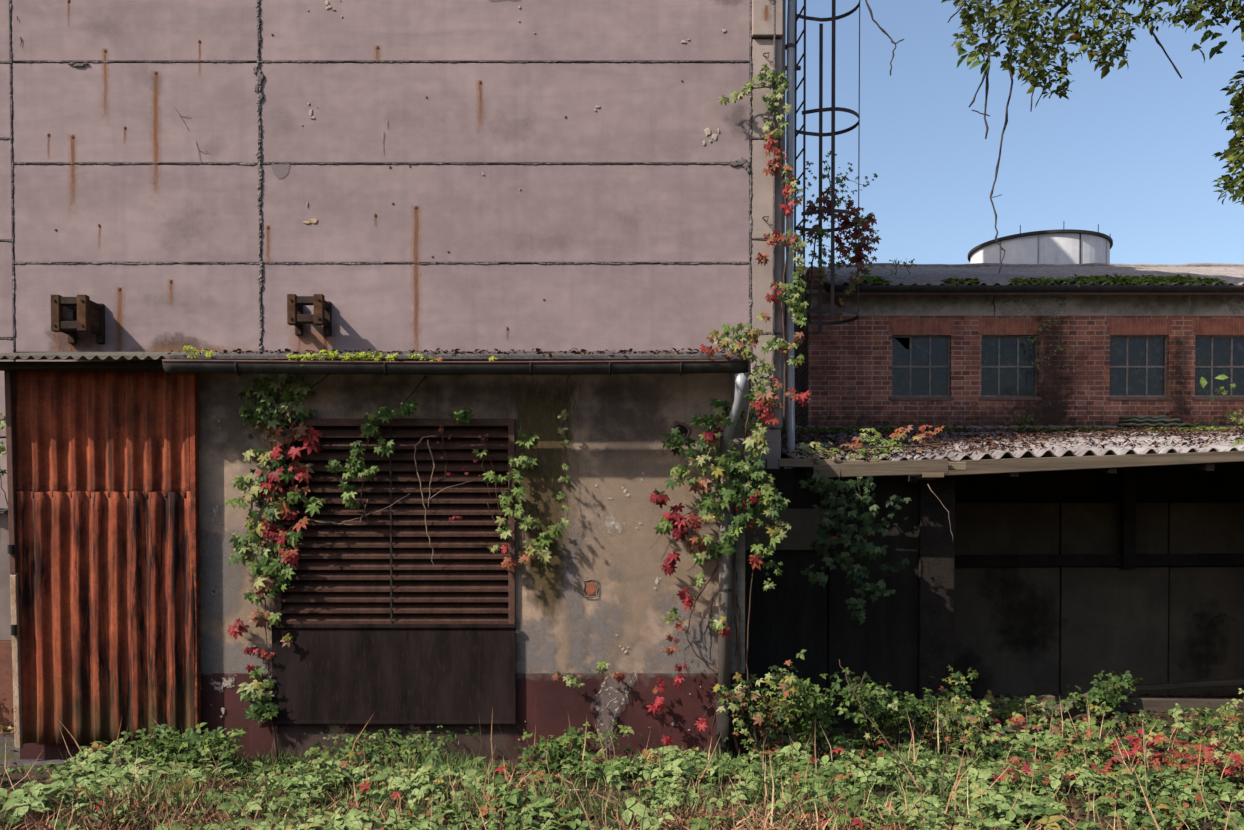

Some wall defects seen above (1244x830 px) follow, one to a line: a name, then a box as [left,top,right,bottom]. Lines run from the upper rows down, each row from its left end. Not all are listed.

rust [414,206,449,341]